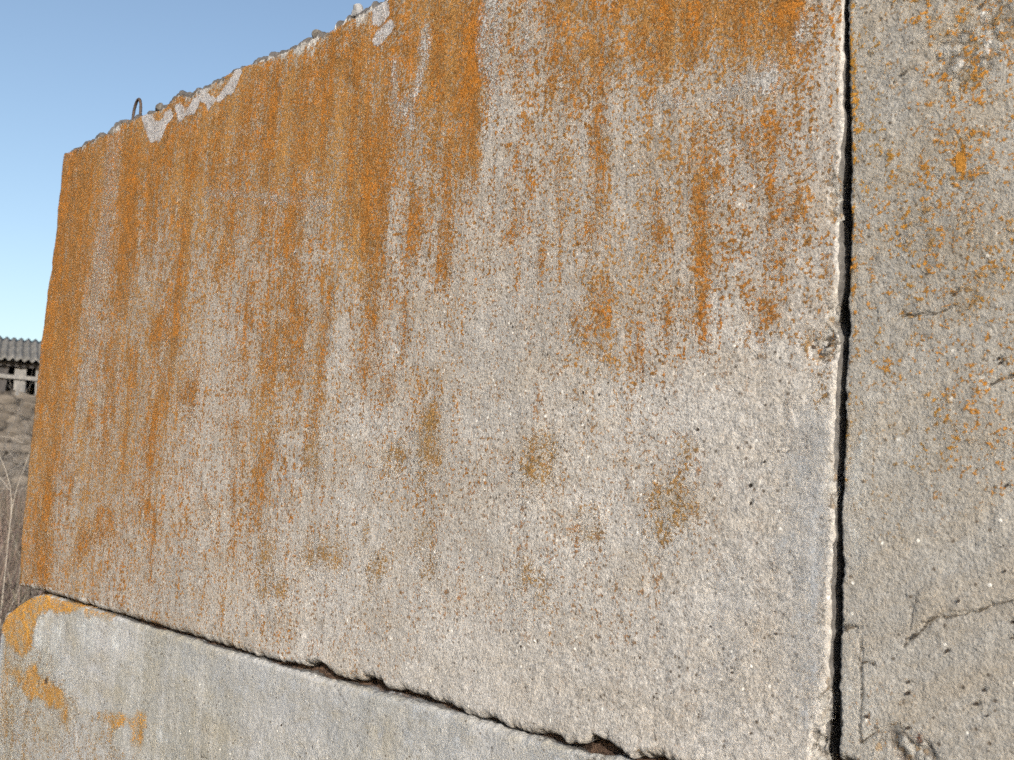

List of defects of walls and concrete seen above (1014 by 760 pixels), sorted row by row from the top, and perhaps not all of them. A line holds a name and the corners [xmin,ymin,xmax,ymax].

peeling [372,0,395,46]
peeling [142,68,242,142]
rust [305,599,390,678]
rust [432,546,469,627]
rust [608,553,664,644]
crack [904,599,1014,648]